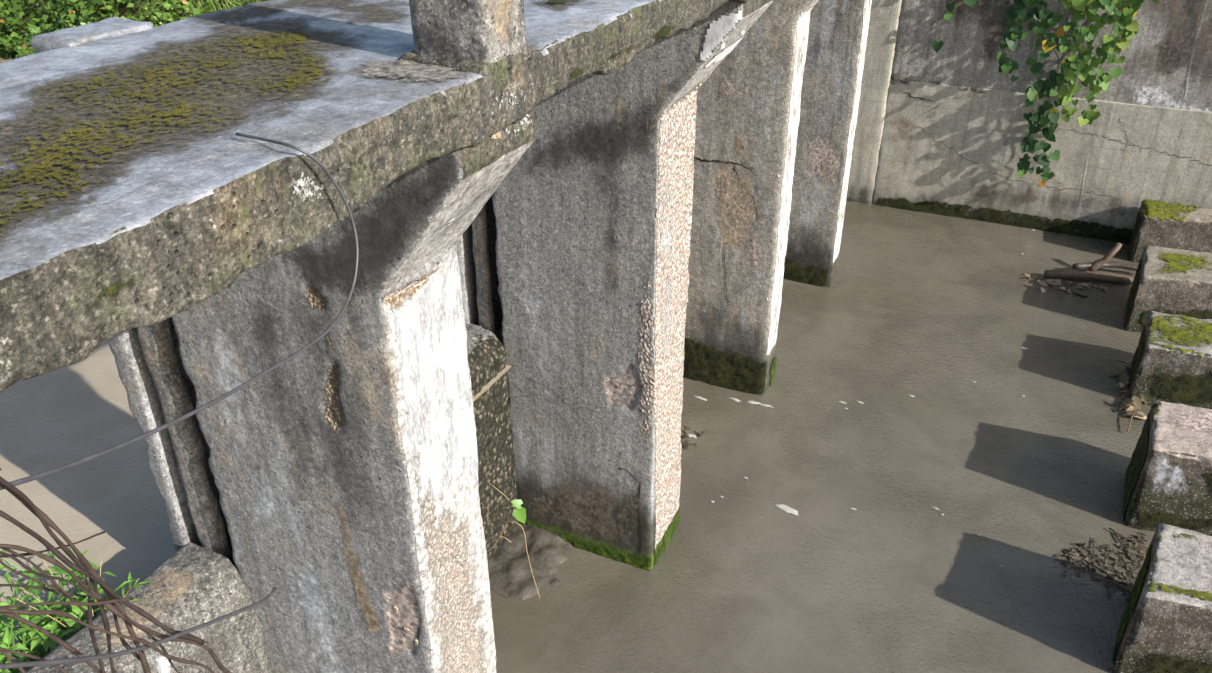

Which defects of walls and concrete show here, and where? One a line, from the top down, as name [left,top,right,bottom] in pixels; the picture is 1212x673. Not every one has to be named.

damp [890,73,941,86]
damp [1124,0,1212,112]
damp [530,102,662,172]
crack [891,76,1212,208]
crack [694,157,758,218]
damp [972,184,1094,217]
spalling [601,11,748,550]
damp [532,474,641,539]